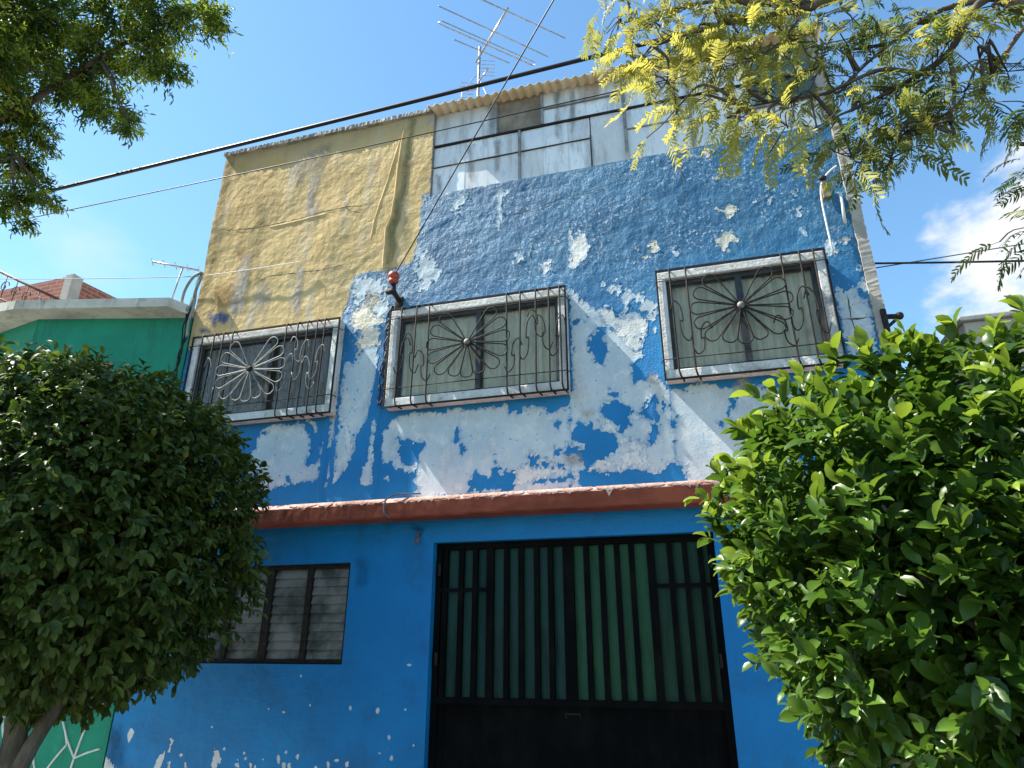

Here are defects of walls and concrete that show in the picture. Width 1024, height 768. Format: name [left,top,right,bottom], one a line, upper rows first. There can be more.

peeling [539,223,590,275]
peeling [715,204,739,253]
peeling [832,264,878,355]
peeling [240,273,799,511]